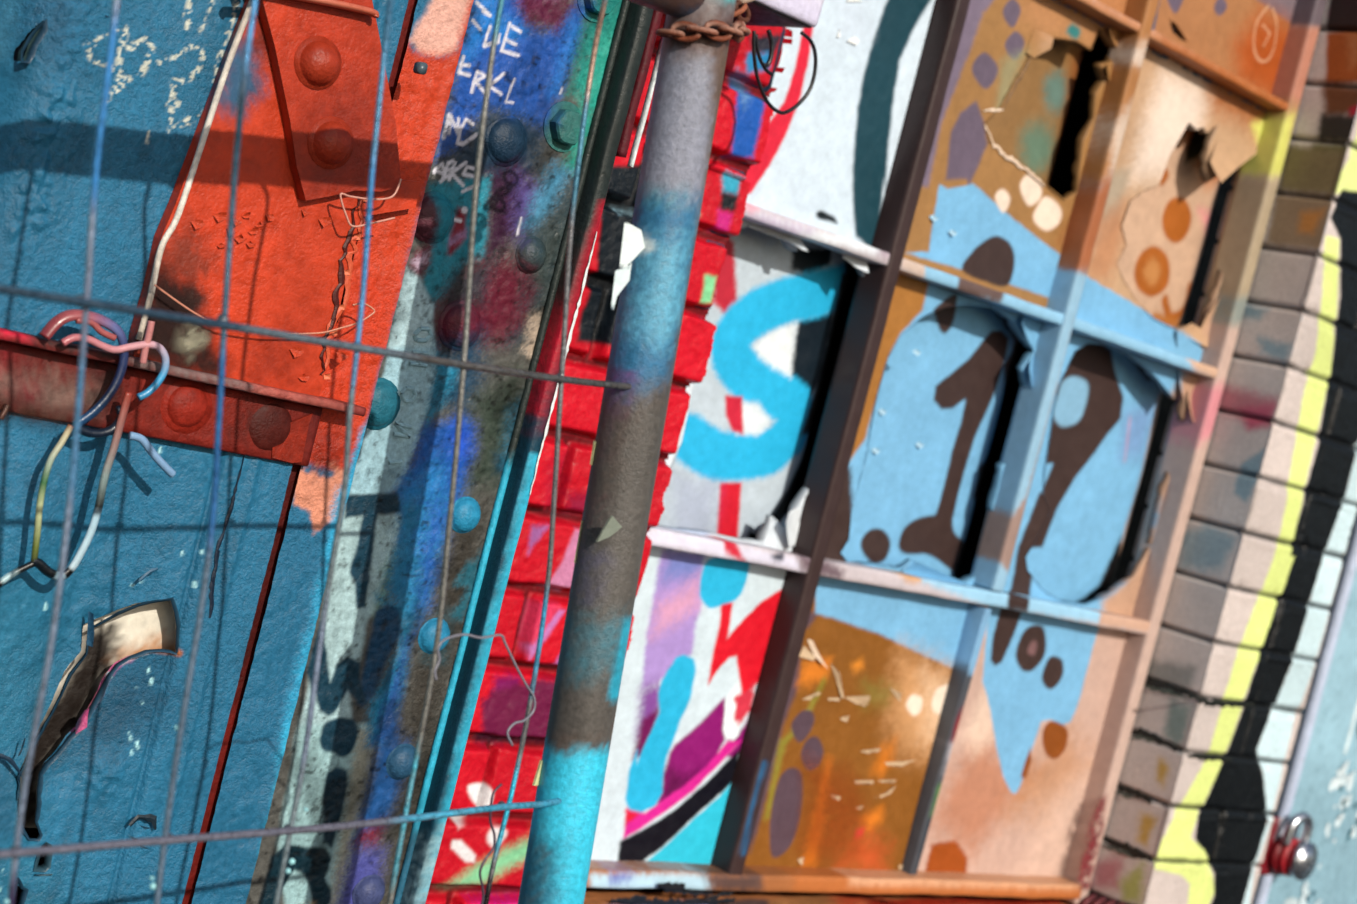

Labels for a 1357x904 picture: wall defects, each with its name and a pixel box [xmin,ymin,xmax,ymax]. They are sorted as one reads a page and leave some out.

peeling [128,814,157,849]